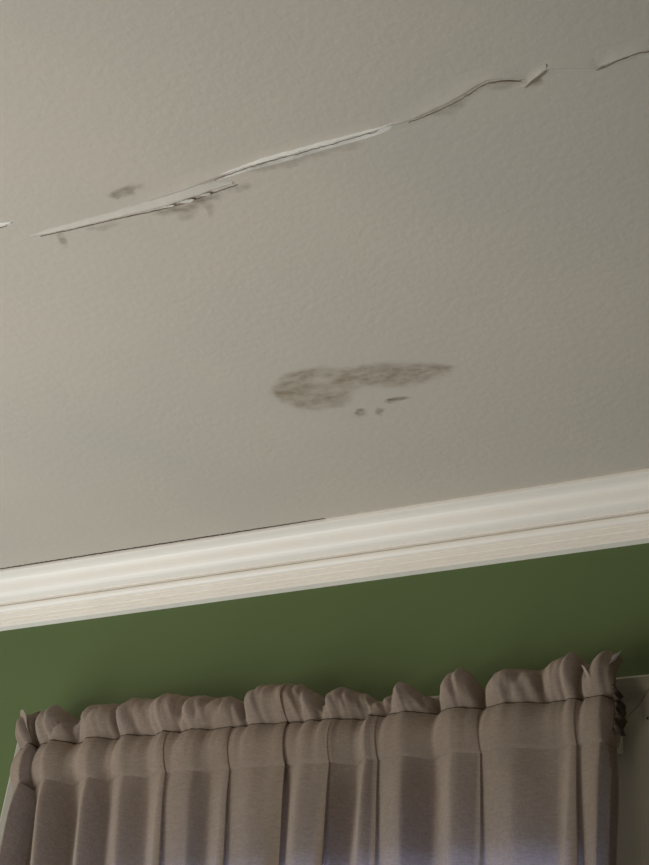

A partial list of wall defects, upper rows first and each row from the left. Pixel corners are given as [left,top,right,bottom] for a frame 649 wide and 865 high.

crack [30,37,649,237]